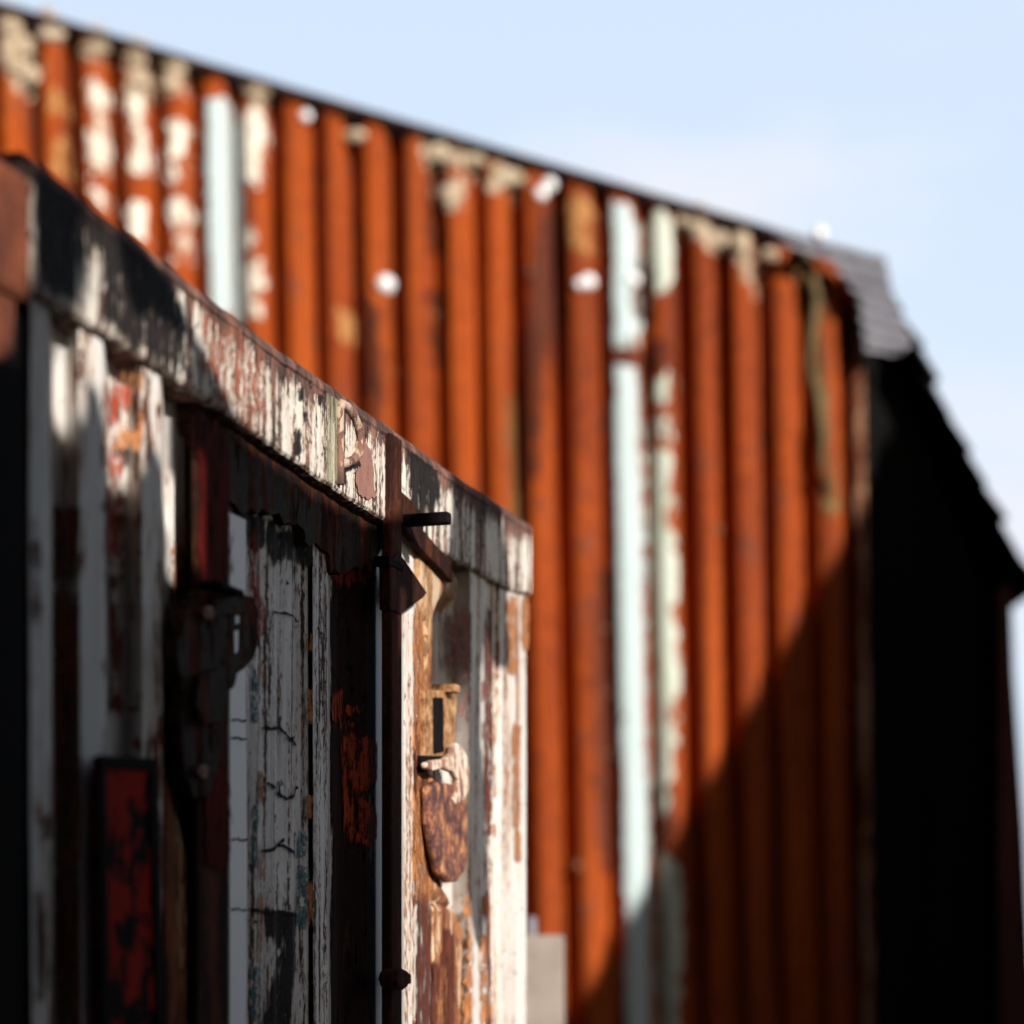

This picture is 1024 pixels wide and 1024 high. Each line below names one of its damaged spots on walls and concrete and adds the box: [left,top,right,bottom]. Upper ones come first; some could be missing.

peeling [294,387,308,455]
peeling [356,442,376,500]
peeling [197,419,313,584]
crack [274,611,325,636]
crack [232,716,296,746]
peeling [205,760,231,873]
crack [267,781,299,800]
corrosion [330,560,377,1024]
corrosion [412,602,496,1024]
crack [232,837,295,855]
crack [231,907,297,917]